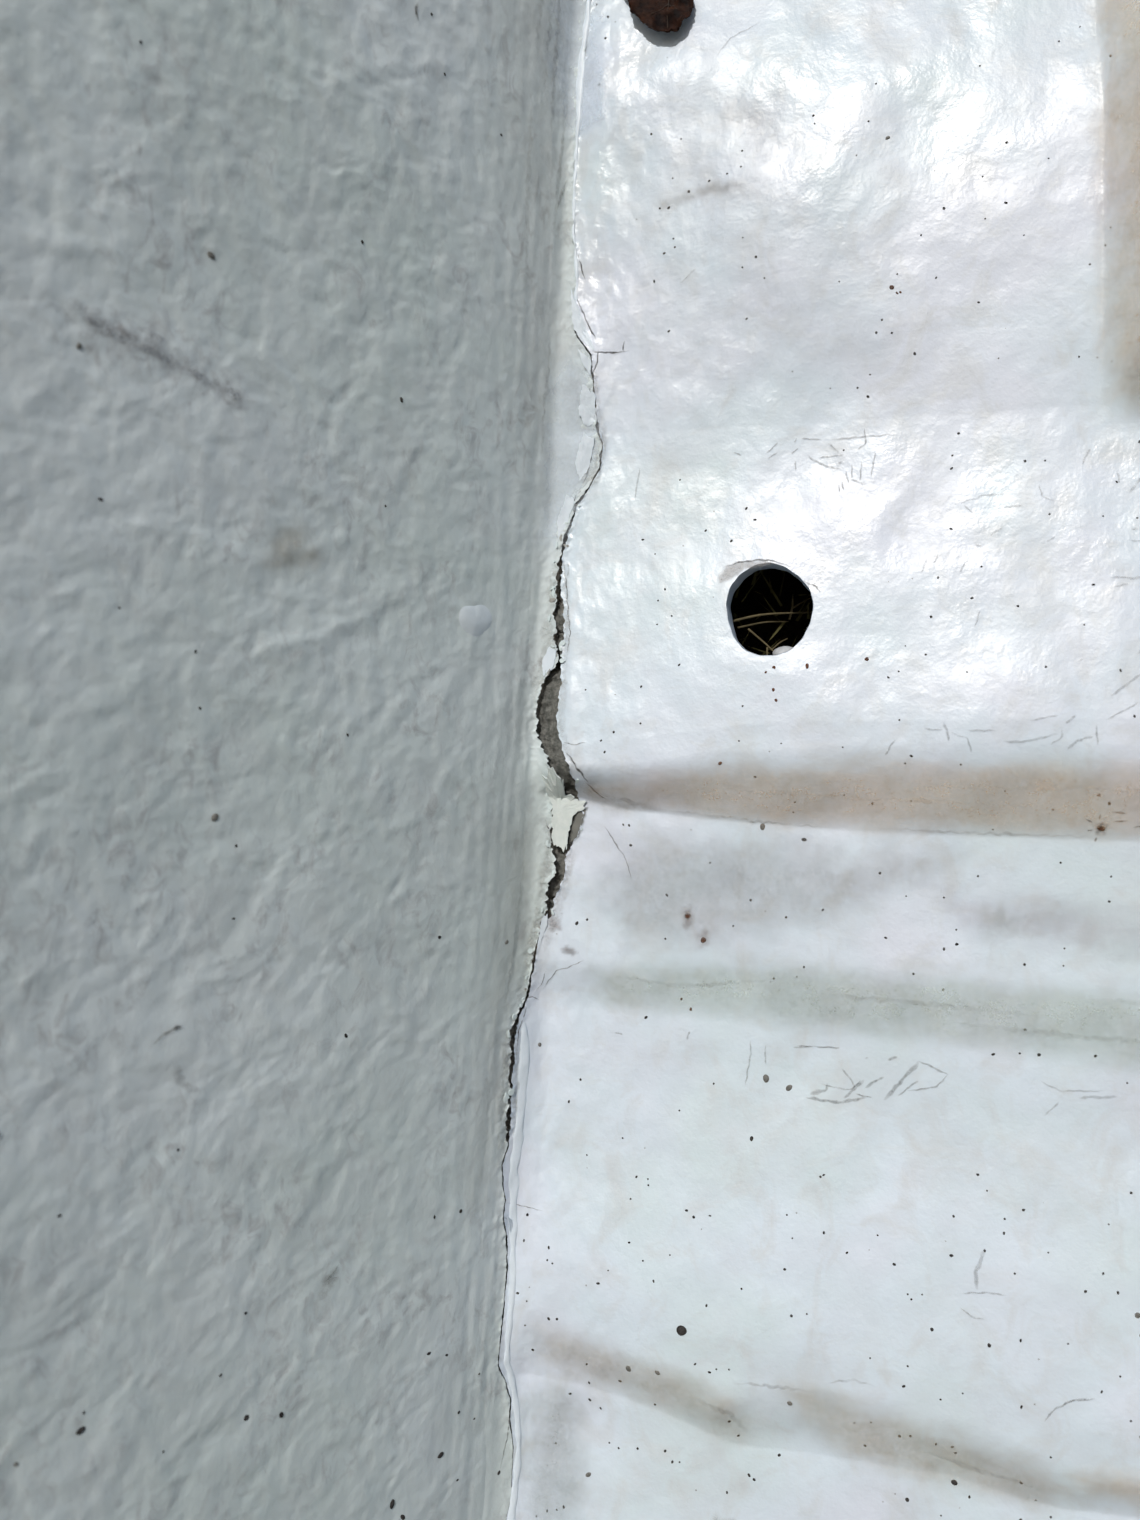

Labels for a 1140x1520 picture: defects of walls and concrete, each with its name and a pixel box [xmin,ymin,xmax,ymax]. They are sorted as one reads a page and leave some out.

crack [498,243,629,1463]
peeling [570,808,587,842]